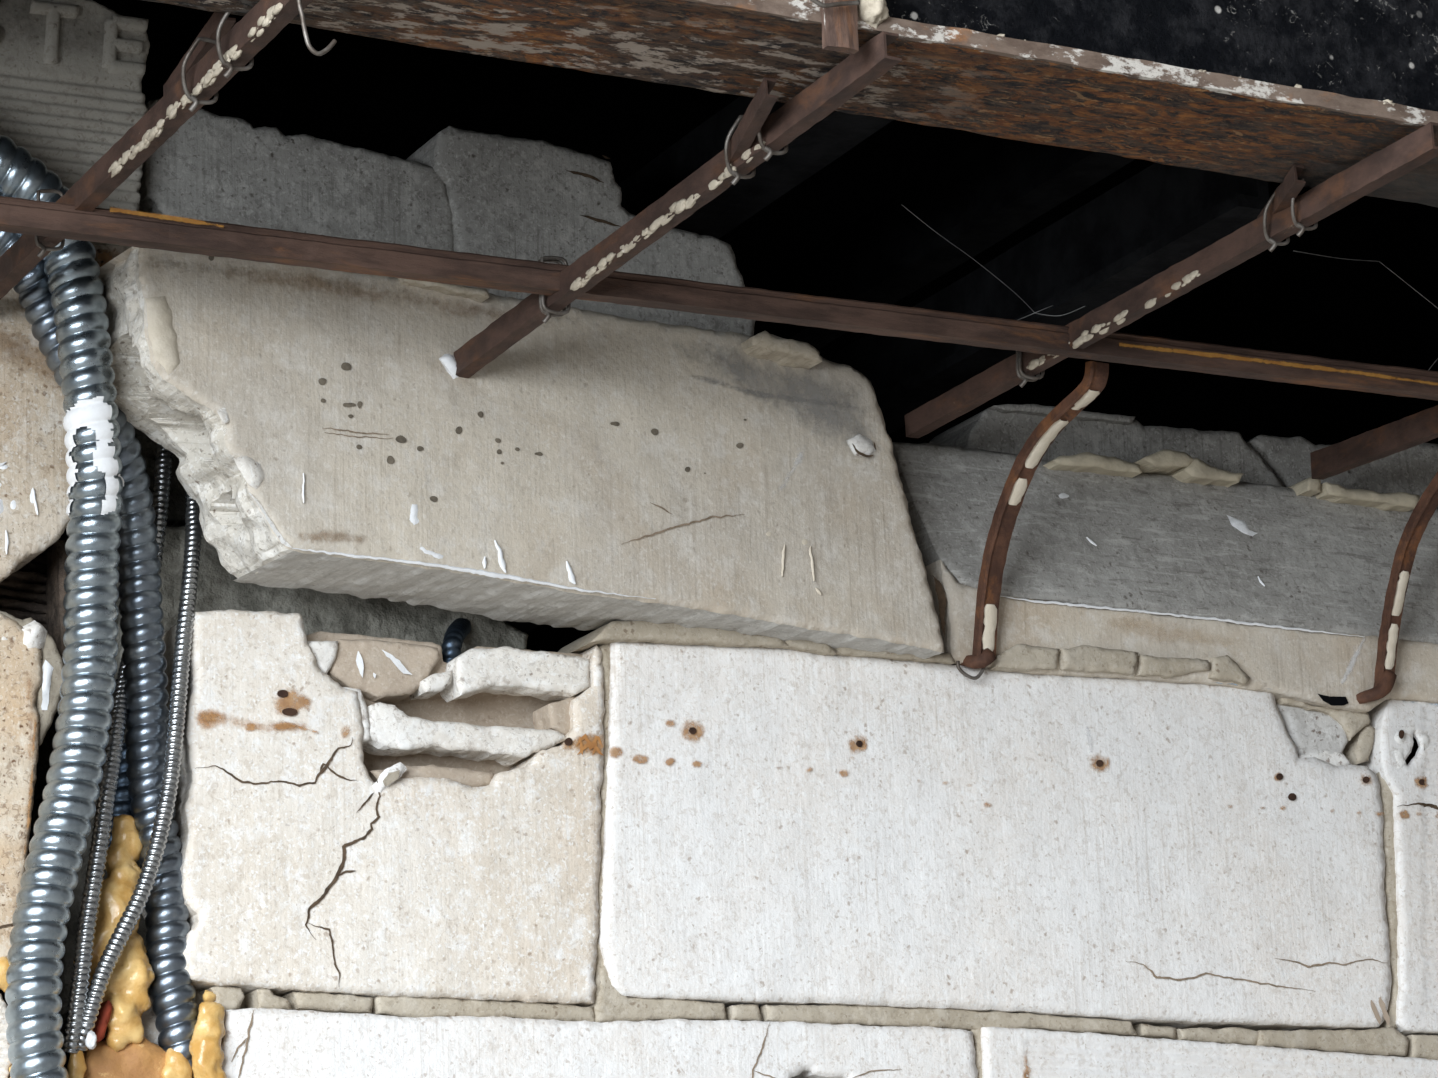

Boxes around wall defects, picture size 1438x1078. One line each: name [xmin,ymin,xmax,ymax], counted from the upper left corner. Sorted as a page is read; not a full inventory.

corrosion [110,207,224,227]
corrosion [1119,343,1438,385]
corrosion [198,712,225,727]
corrosion [274,722,317,732]
spalling [306,631,591,793]
crack [1397,802,1438,810]
crack [195,738,381,980]
crack [1126,958,1384,991]
crack [752,1023,775,1078]
crack [853,1069,902,1078]